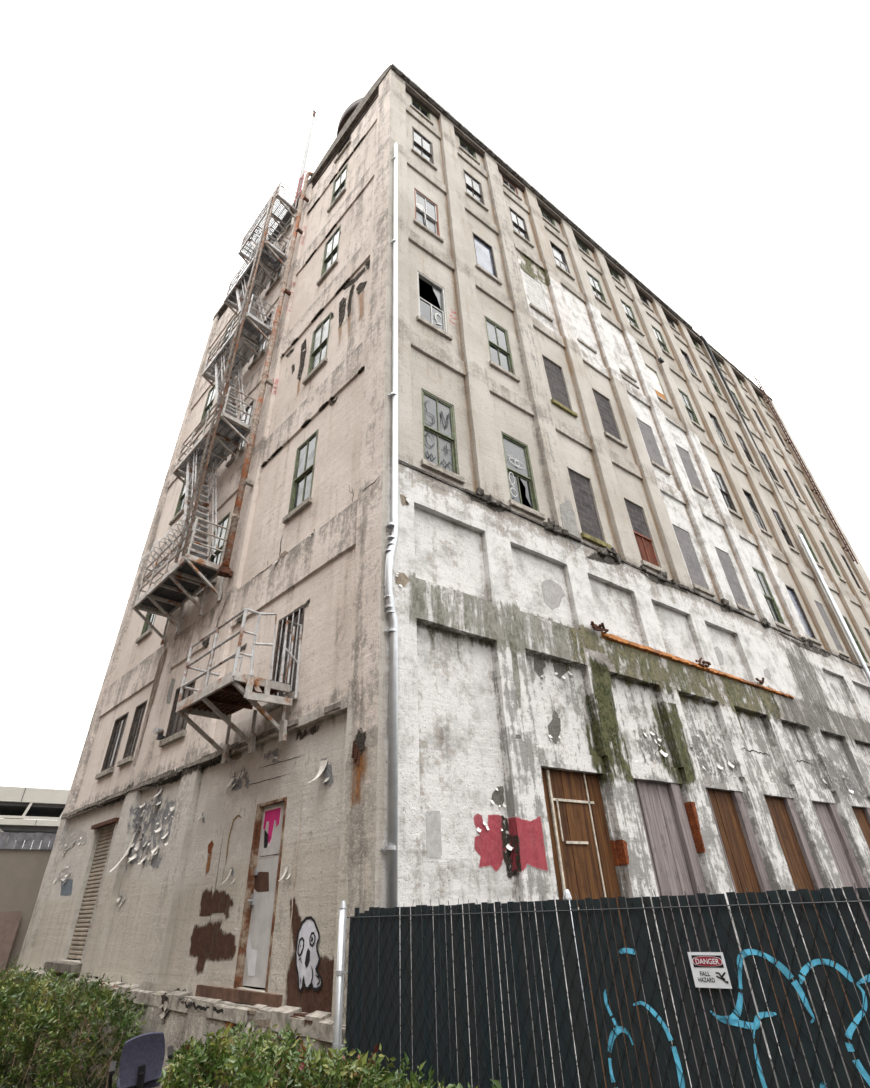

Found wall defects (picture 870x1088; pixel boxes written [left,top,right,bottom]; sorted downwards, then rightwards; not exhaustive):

water stain [429,614,442,650]
water stain [509,635,521,708]
corrosion [352,728,366,803]
peeling [109,787,176,872]